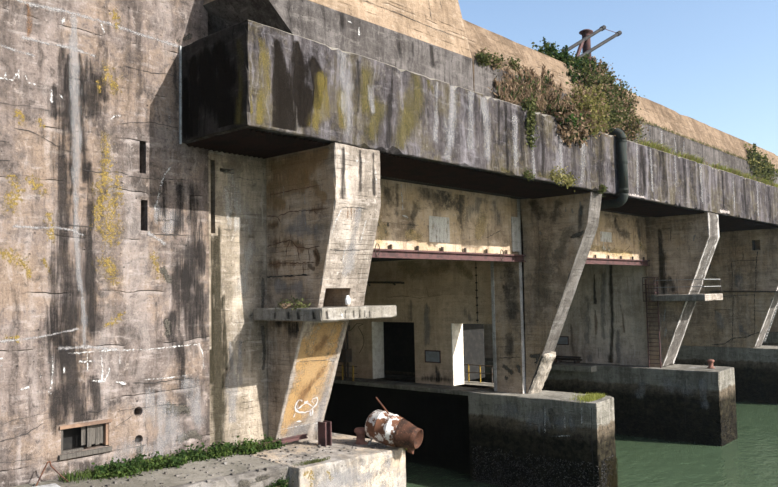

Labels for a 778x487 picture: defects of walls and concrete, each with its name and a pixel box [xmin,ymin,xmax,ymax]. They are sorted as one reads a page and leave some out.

water stain [272,39,327,131]
water stain [498,101,509,169]
water stain [47,48,110,429]
crack [231,177,365,278]
water stain [124,167,228,446]